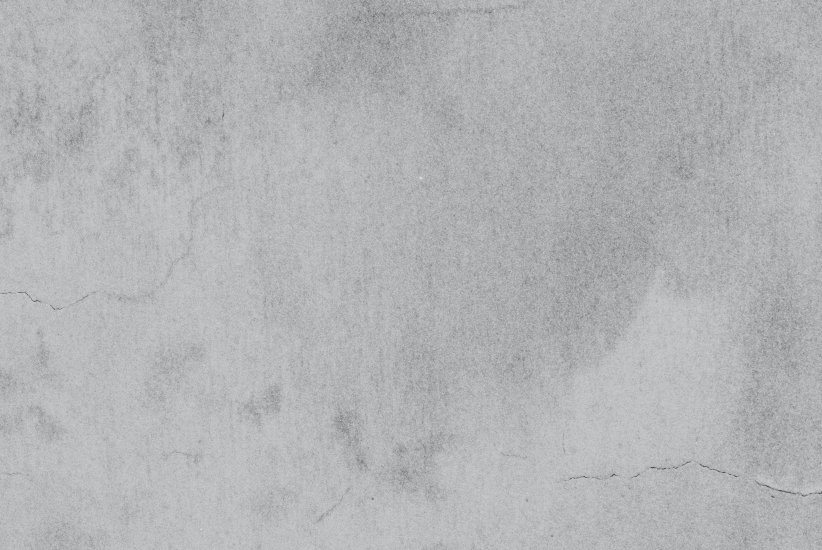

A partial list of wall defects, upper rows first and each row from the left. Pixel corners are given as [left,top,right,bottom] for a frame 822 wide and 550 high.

crack [349,0,536,31]
crack [2,185,221,310]
crack [556,427,738,489]